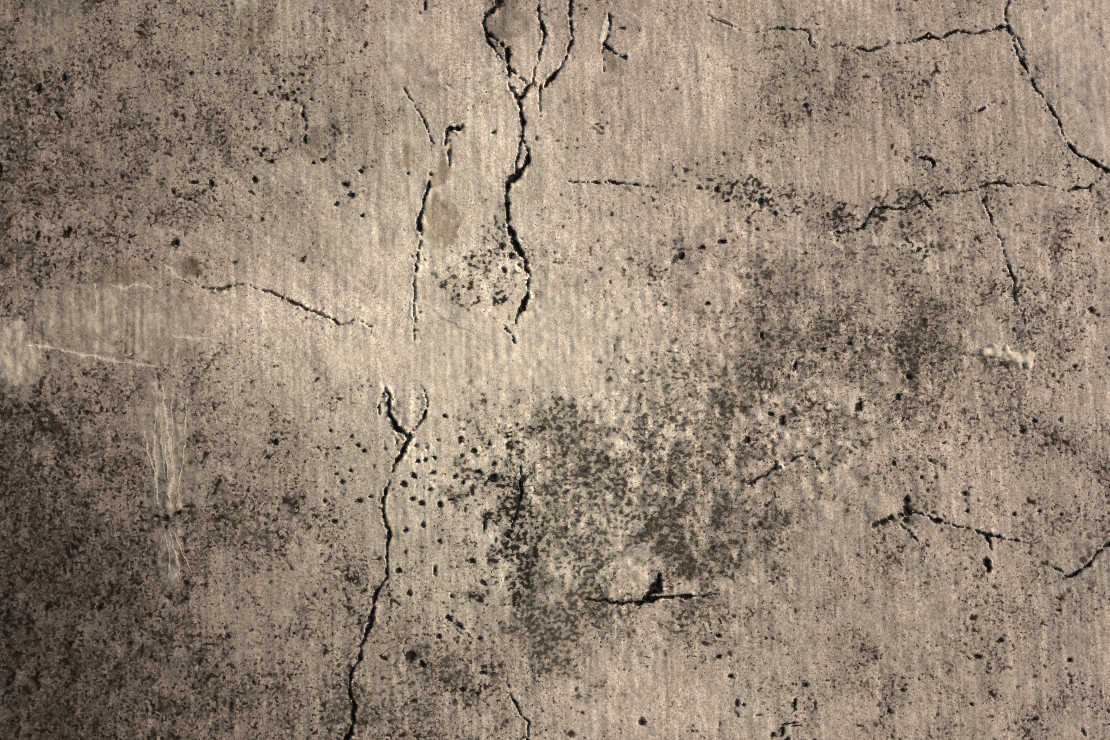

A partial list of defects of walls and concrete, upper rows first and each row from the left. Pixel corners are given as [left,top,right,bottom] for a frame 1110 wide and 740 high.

crack [602,13,627,71]
crack [482,0,573,343]
crack [569,179,647,187]
crack [708,1,1110,332]
crack [408,96,463,333]
crack [183,280,371,327]
crack [344,387,428,740]
crack [587,575,716,606]
crack [900,512,1026,573]
crack [1050,542,1110,578]